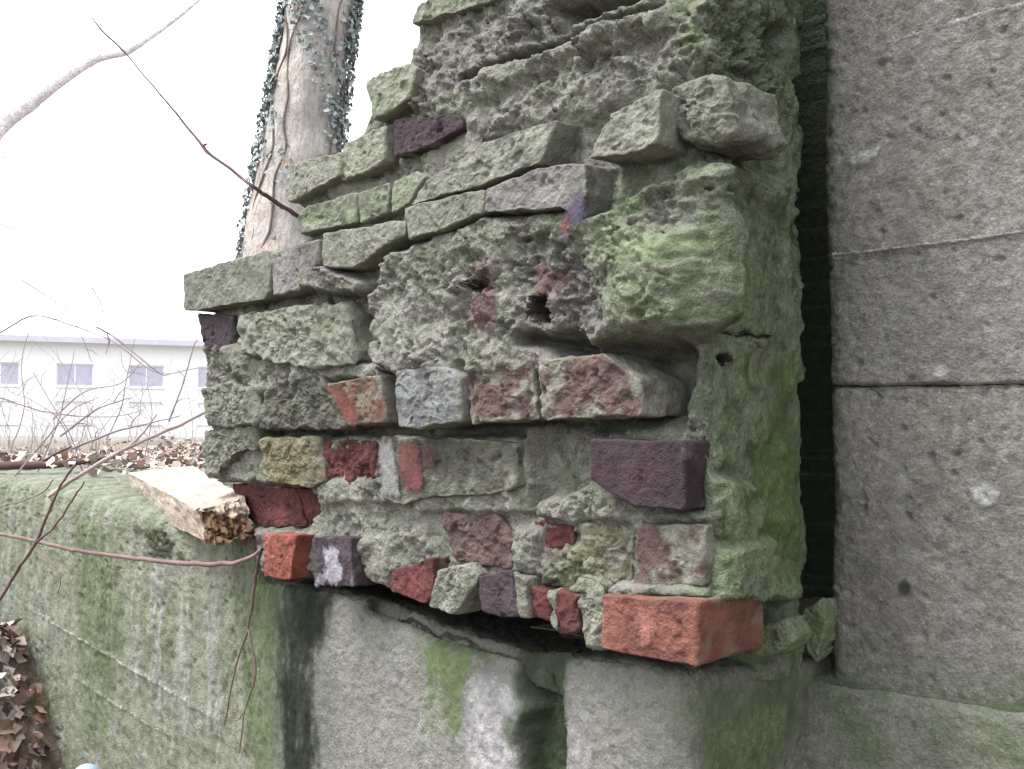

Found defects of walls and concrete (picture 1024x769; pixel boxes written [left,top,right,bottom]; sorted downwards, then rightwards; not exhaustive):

leakage [274,547,342,769]